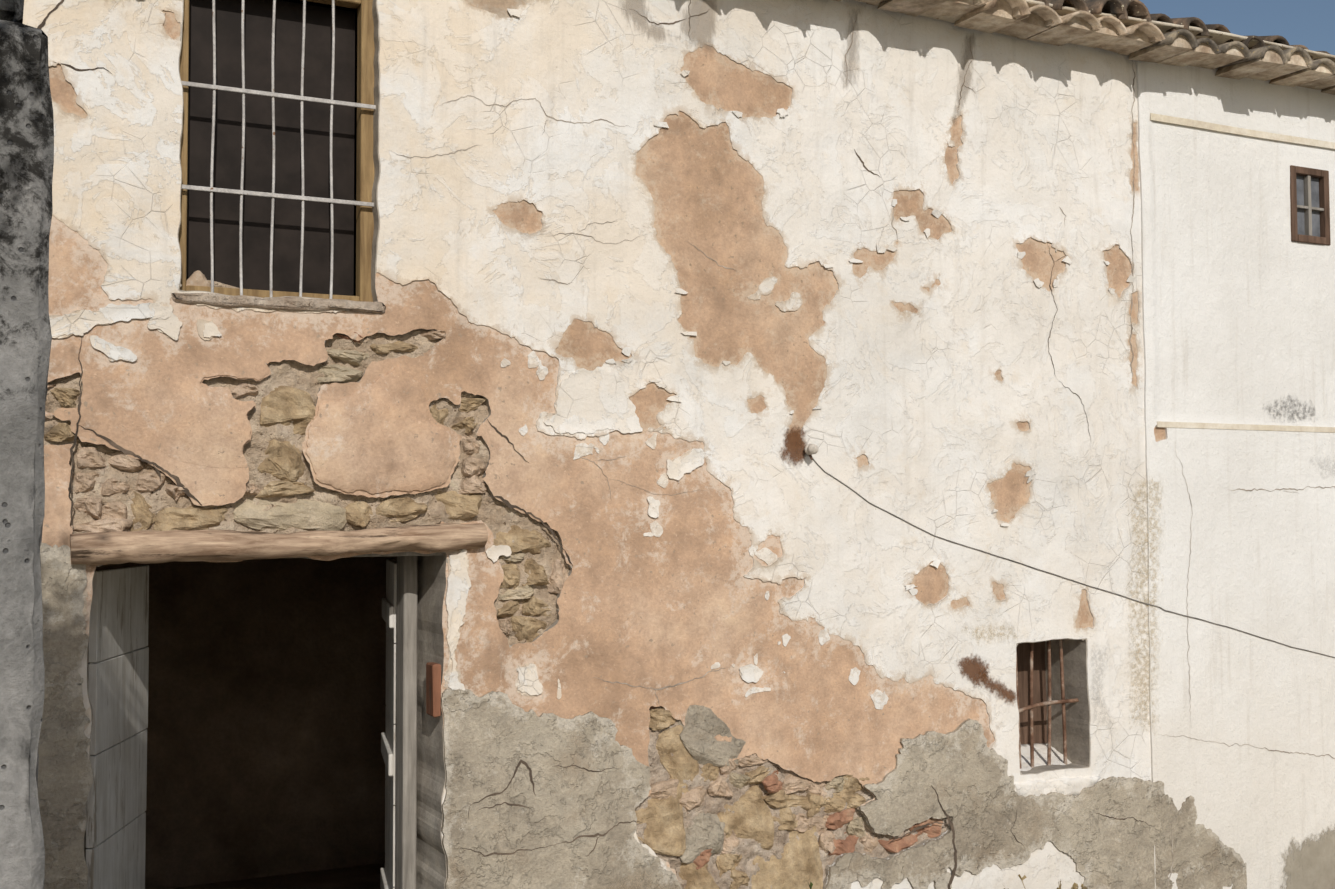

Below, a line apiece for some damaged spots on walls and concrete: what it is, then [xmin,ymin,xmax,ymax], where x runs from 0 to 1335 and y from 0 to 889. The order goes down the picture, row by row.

crack [37,0,64,29]
crack [55,62,112,74]
peeling [636,45,838,433]
peeling [892,189,952,240]
peeling [1016,237,1072,291]
crack [1128,64,1136,380]
peeling [1103,244,1138,386]
peeling [42,216,995,809]
peeling [987,463,1036,526]
crack [464,760,642,857]
crack [891,785,957,889]
leakage [1281,828,1335,889]